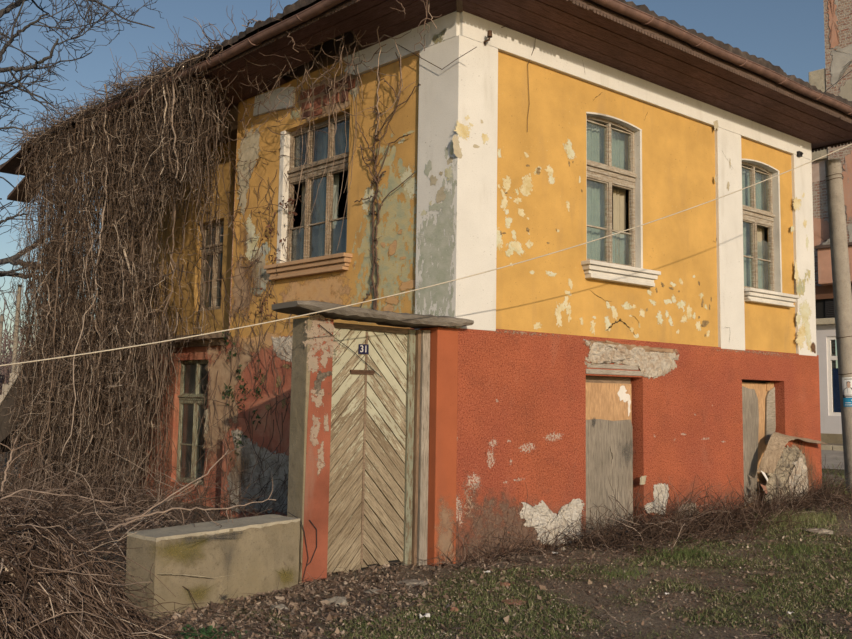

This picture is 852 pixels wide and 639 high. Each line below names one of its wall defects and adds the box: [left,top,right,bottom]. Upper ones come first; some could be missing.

peeling [563,139,577,166]
peeling [230,213,272,317]
peeling [281,115,489,317]
peeling [497,152,555,266]
spalling [554,275,712,379]
peeling [794,260,816,353]
spalling [203,332,293,515]
peeling [303,312,341,475]
spalling [520,498,584,546]
spalling [640,475,669,515]